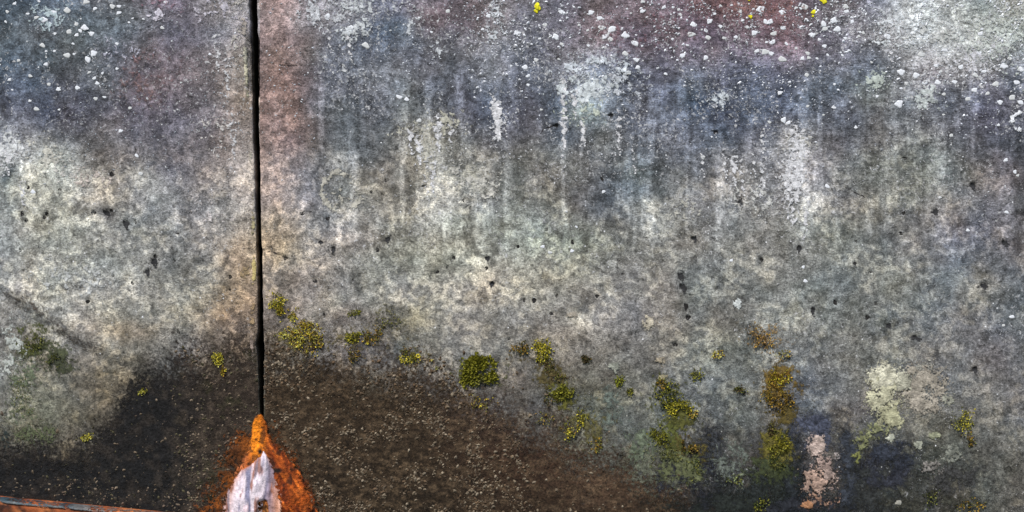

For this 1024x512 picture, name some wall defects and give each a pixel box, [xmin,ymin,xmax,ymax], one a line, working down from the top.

leakage [483,0,507,41]
leakage [387,104,511,208]
leakage [485,88,509,148]
leakage [538,51,660,180]
leakage [702,83,738,111]
leakage [718,121,818,245]
corrosion [194,414,325,512]
leakage [0,319,1014,512]